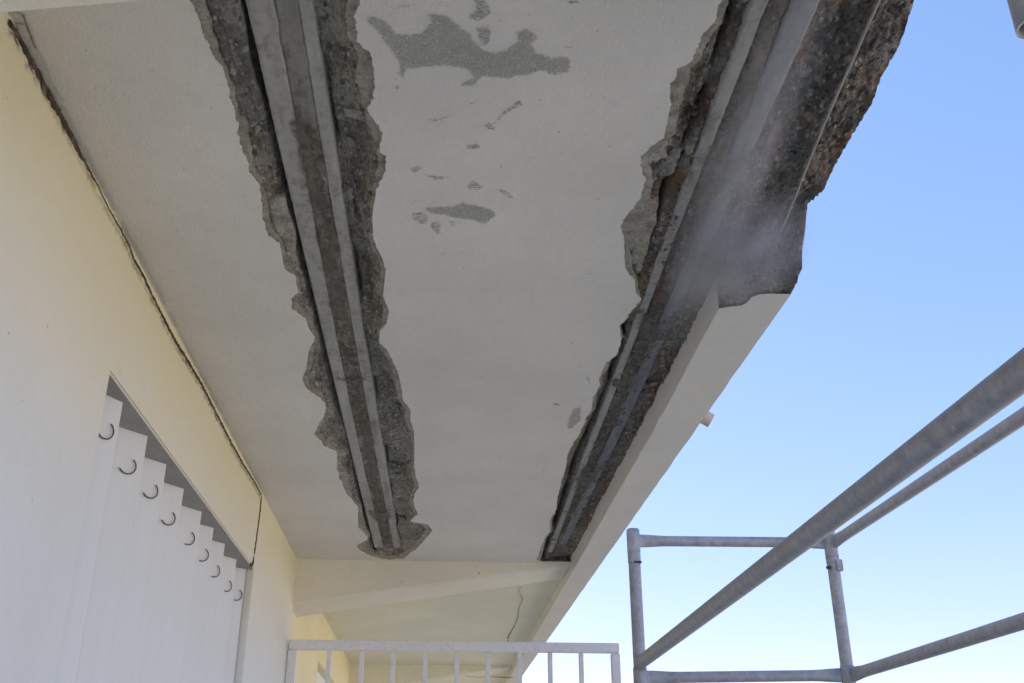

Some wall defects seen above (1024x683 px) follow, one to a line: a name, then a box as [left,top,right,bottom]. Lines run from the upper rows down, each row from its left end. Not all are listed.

spalling [191,0,432,559]
peeling [427,204,494,224]
peeling [369,0,570,86]
spalling [536,0,914,561]